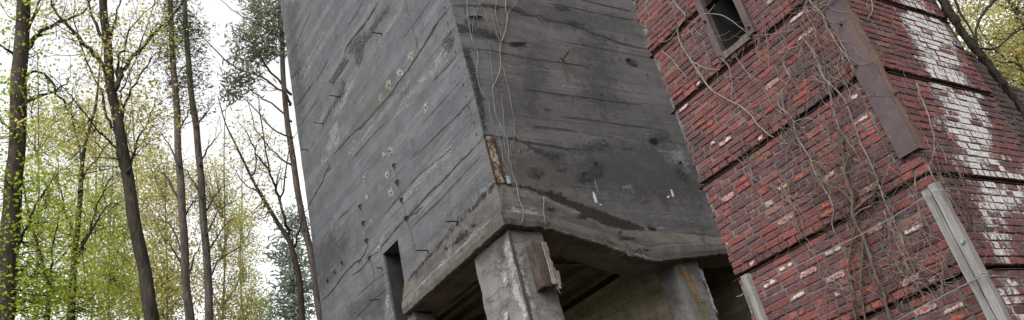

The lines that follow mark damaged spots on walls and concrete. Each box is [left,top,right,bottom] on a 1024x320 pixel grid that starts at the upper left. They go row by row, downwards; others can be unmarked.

spalling [501,239,540,320]
efflorescence [894,0,1024,320]